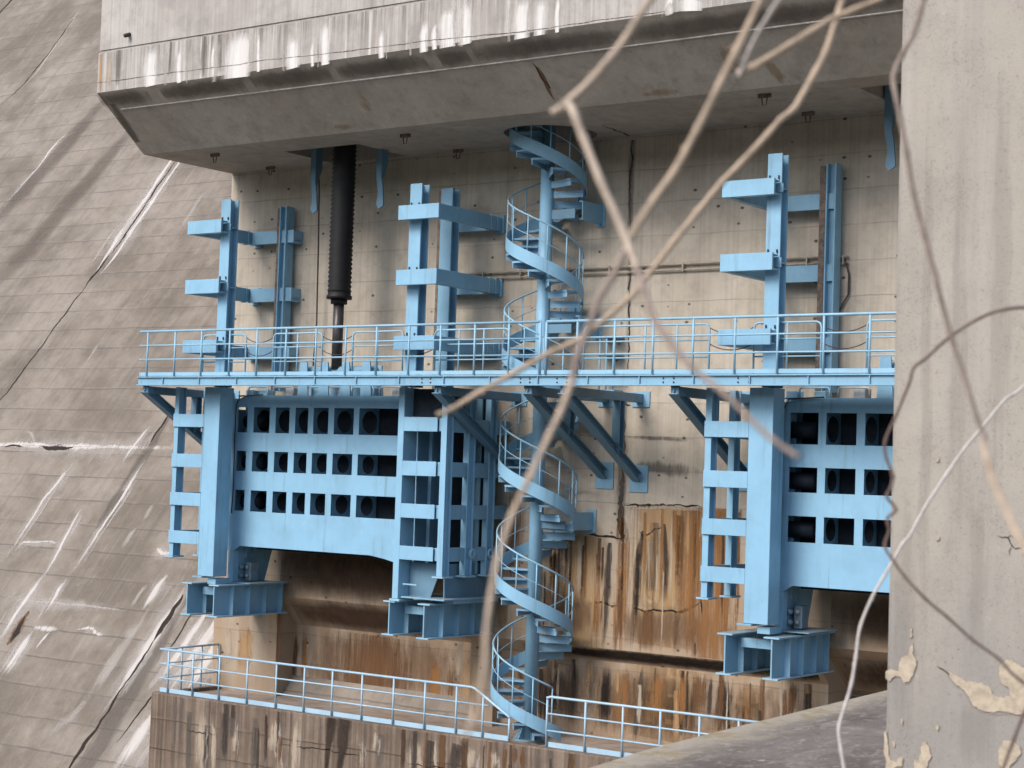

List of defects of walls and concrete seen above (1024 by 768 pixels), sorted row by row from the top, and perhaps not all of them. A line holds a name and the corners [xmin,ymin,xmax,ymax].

damp [342,5,471,75]
damp [490,0,609,57]
damp [638,0,859,37]
damp [100,27,329,141]
crack [533,64,554,99]
crack [0,160,180,400]
corrosion [540,506,740,659]
crack [69,594,183,768]
corrosion [614,665,706,743]
peeling [885,628,918,685]
peeling [945,658,1024,717]
peeling [884,730,932,768]